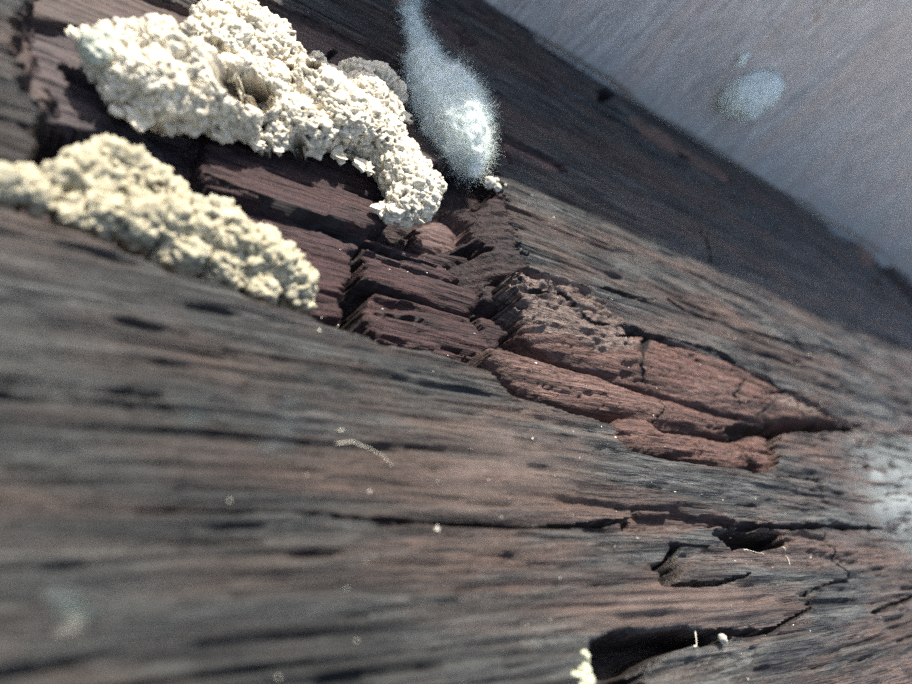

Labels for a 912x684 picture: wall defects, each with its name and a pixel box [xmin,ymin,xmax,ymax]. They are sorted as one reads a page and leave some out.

spalling [7,0,863,474]
crack [136,501,912,593]